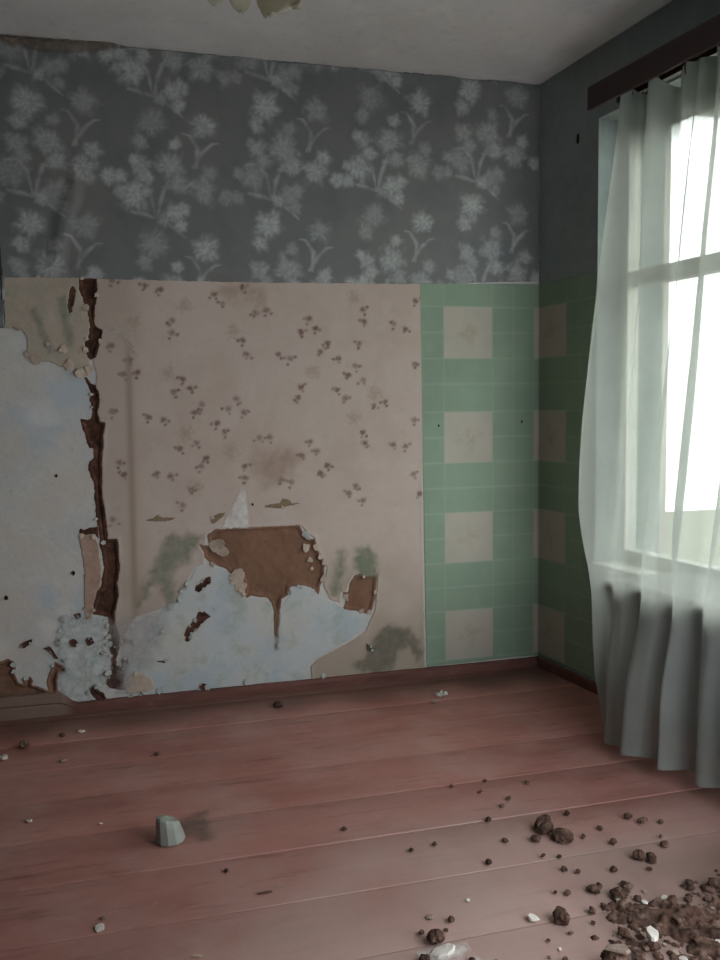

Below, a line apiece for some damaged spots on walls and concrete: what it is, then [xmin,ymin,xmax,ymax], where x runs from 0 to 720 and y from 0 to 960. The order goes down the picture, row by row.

crack [67,277,134,700]
peeling [0,522,377,702]
water stain [358,628,420,671]